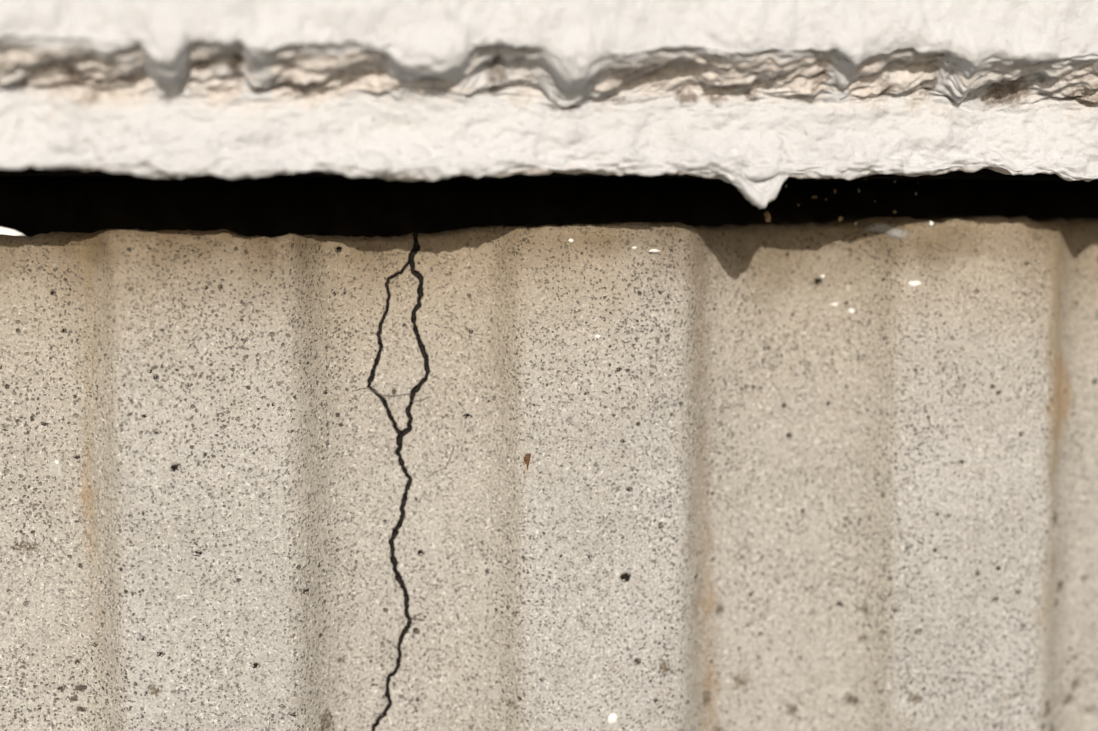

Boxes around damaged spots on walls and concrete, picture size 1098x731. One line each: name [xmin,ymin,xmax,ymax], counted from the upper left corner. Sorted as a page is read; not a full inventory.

crack [353,233,454,731]